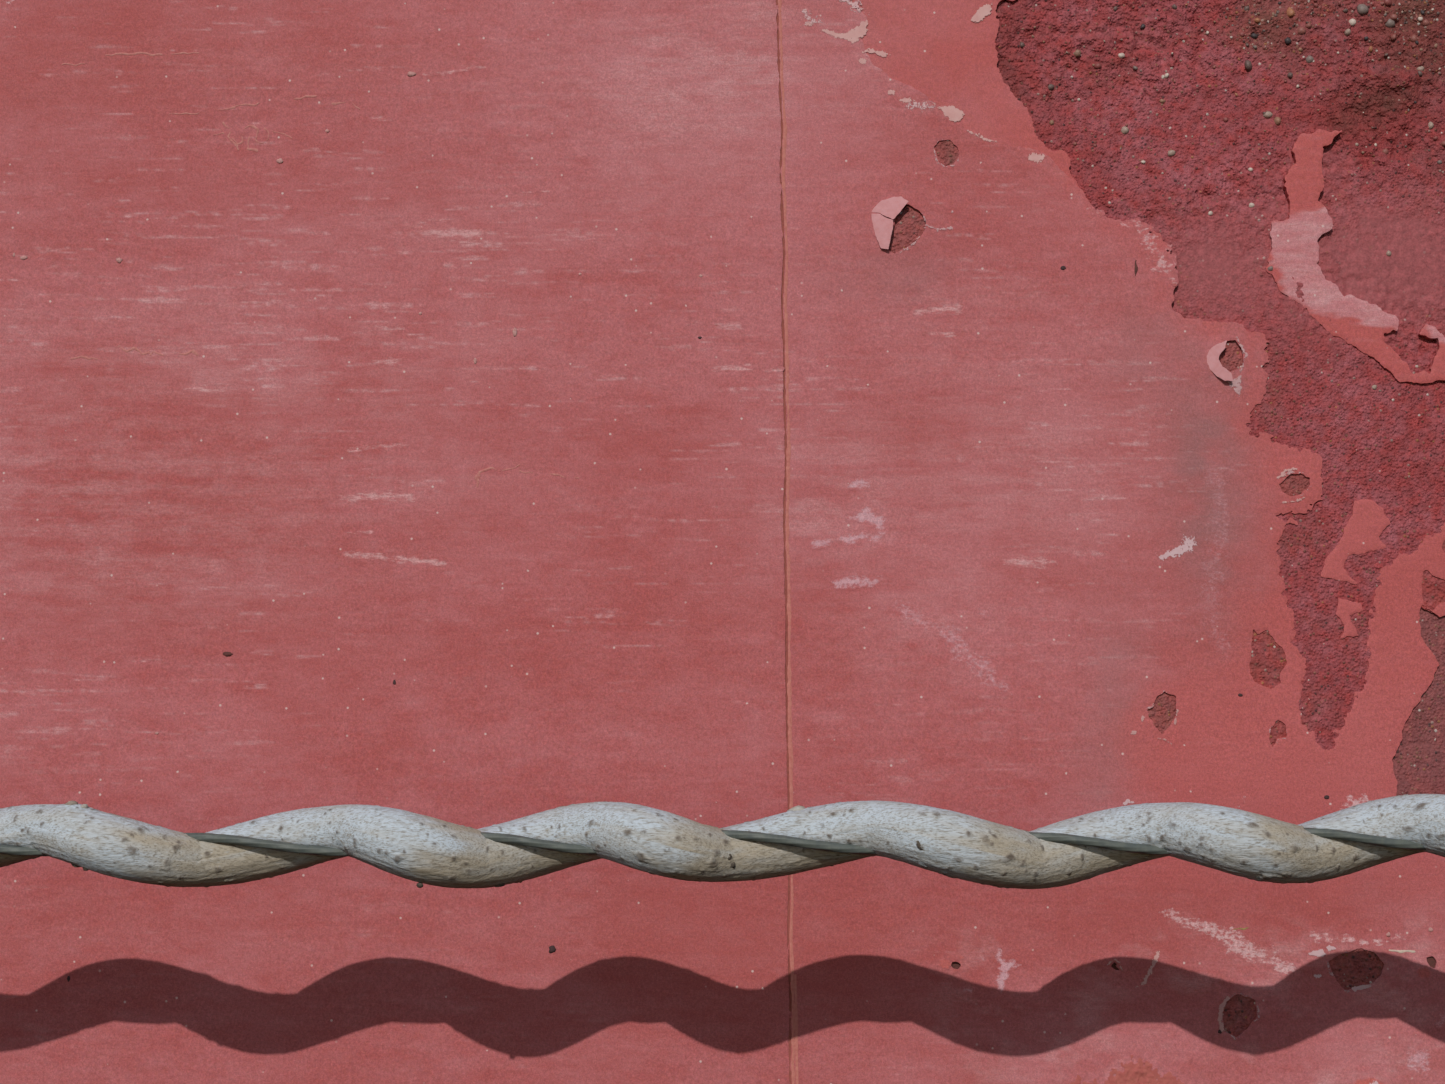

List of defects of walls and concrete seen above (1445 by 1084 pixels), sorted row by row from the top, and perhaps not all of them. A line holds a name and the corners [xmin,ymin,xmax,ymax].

crack [776,0,794,810]
flaking render [802,0,1445,750]
flaking render [1392,570,1445,796]
crack [787,874,798,1084]
peeling [1218,993,1260,1040]
peeling [1309,945,1384,992]